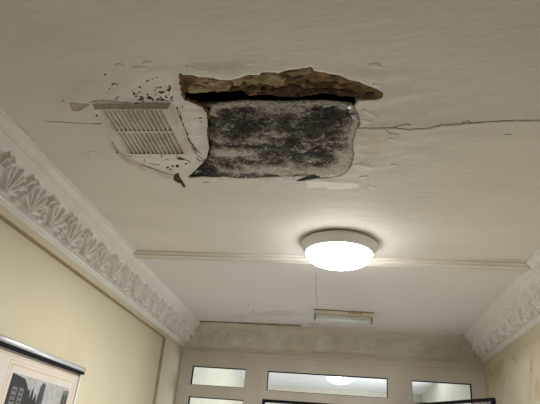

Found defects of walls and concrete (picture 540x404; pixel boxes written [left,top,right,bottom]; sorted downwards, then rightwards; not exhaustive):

peeling [62,77,173,112]
flaking render [180,65,384,99]
crack [358,120,540,135]
flaking render [166,158,188,188]